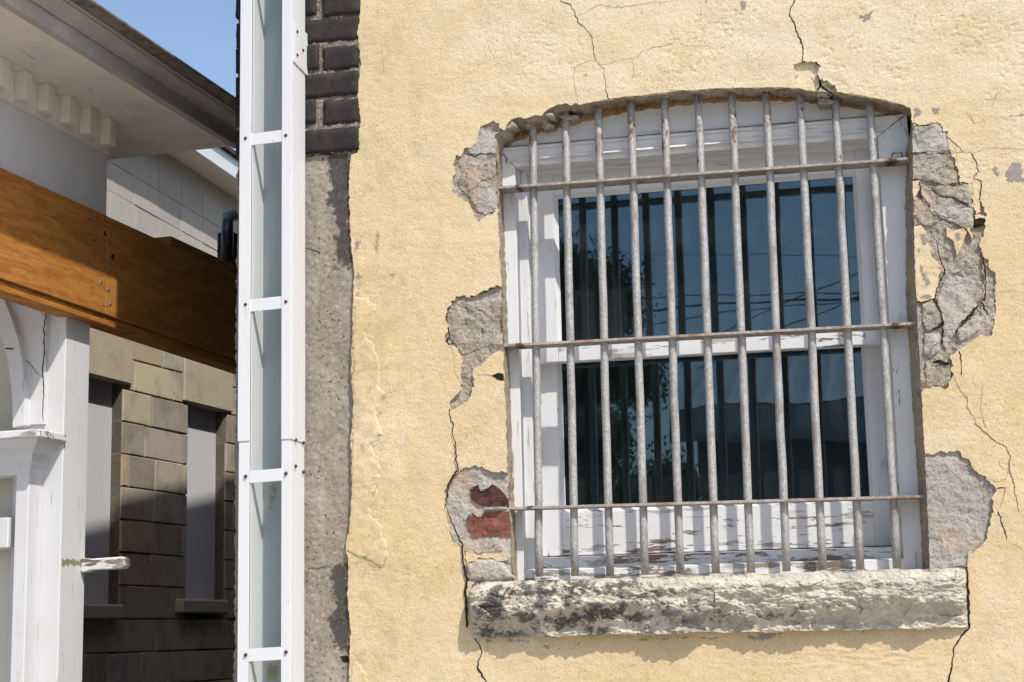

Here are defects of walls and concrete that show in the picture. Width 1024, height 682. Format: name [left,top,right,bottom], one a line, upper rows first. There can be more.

crack [562,0,704,100]
crack [789,0,804,60]
spalling [452,112,581,222]
crack [947,136,1017,200]
peeling [991,162,1024,182]
spalling [910,103,996,391]
spalling [445,286,504,410]
crack [953,351,1019,547]
crack [445,409,488,682]
spalling [445,465,516,582]
spalling [925,451,996,570]
crack [948,566,971,682]